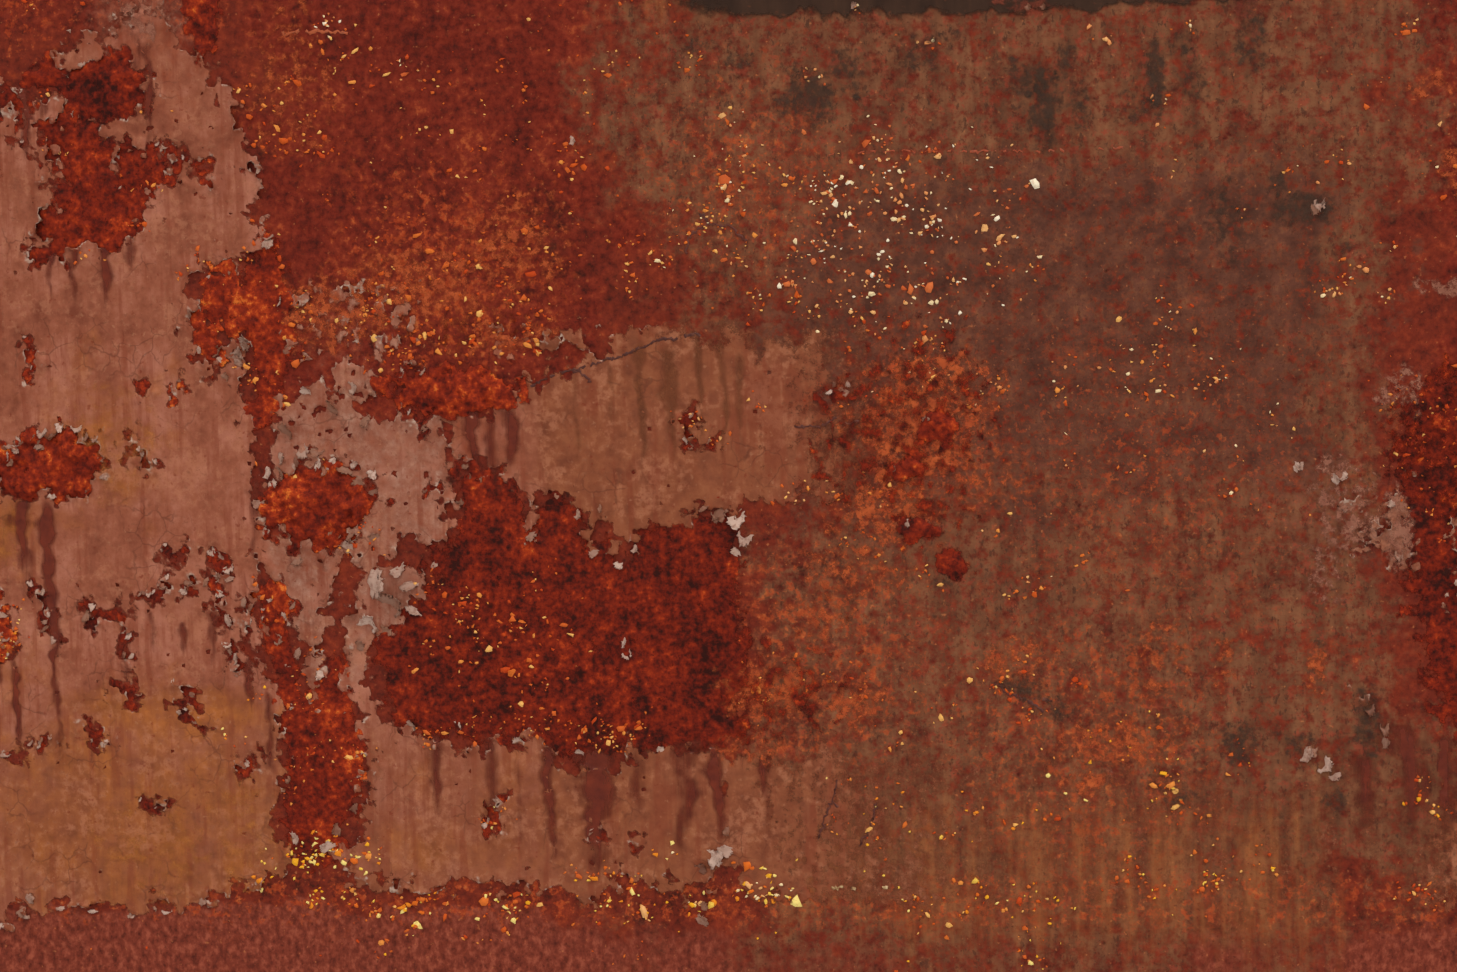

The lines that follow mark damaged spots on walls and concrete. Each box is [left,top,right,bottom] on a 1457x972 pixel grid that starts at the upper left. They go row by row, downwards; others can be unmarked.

peeling [0,417,110,505]
peeling [0,46,216,271]
peeling [187,227,394,566]
rust [233,0,452,167]
rust [232,50,640,467]
peeling [137,454,754,875]
rust [408,558,669,926]
crack [516,332,701,399]
rust [678,861,802,932]
rust [606,106,1045,860]
rust [826,777,1076,971]
peeling [1382,356,1457,752]